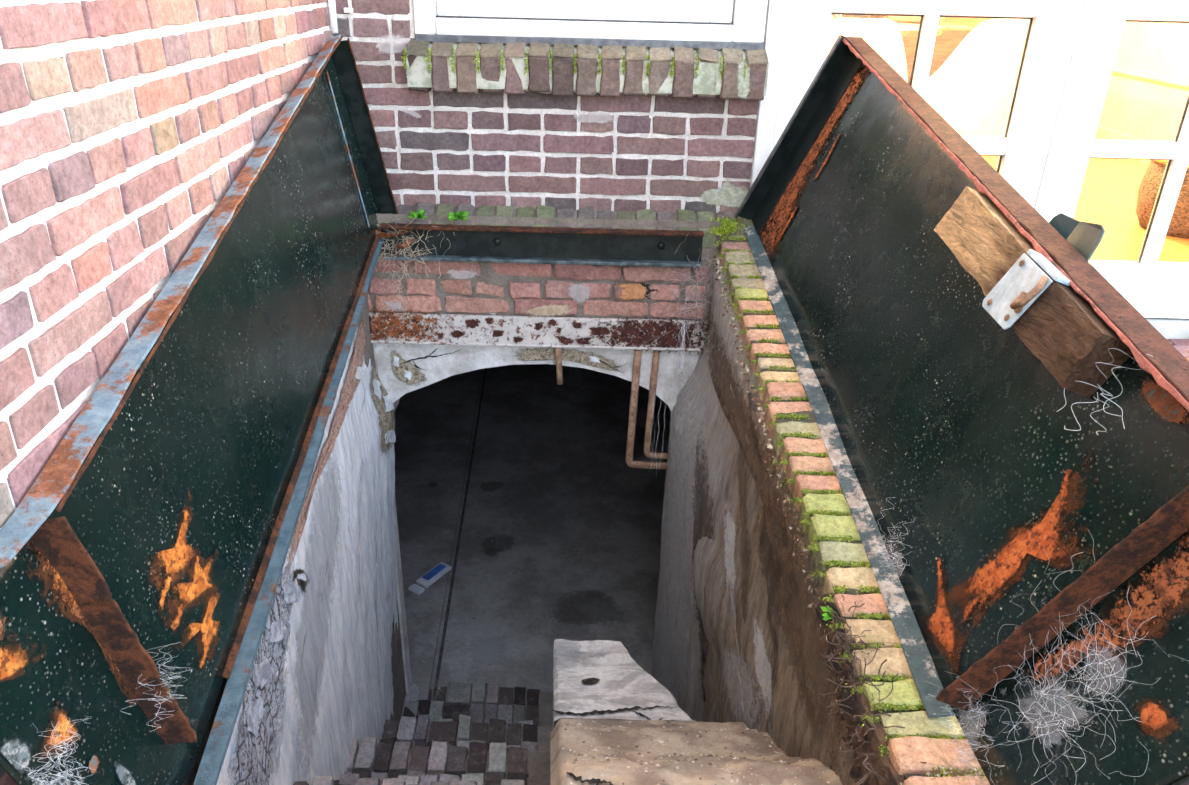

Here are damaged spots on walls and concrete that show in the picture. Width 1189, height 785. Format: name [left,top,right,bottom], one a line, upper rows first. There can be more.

rust [760,66,871,266]
peeling [391,350,427,386]
rust [368,308,524,344]
rust [533,316,711,355]
rust [143,487,224,672]
peeling [228,318,396,785]
rust [921,440,1099,675]
rust [1025,528,1189,689]
rust [0,613,45,682]
crack [552,706,677,720]
rust [1136,698,1181,744]
crack [567,771,613,785]